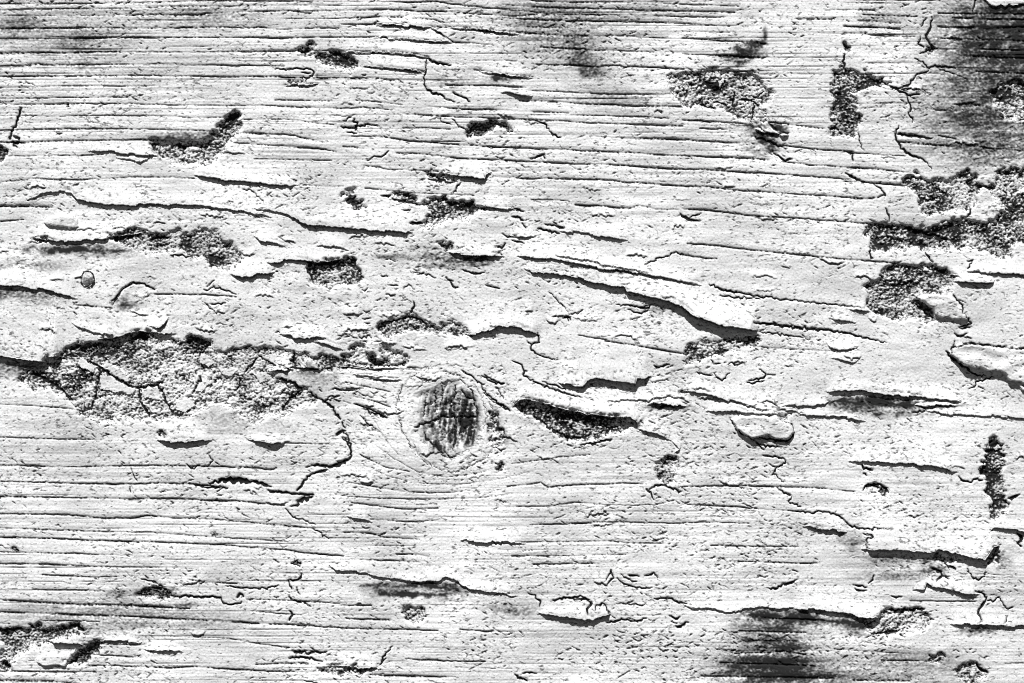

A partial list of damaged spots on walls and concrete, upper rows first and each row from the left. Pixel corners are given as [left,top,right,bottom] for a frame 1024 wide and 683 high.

spalling [89,111,298,186]
spalling [668,68,787,136]
spalling [830,44,891,138]
crack [887,19,965,169]
spalling [0,301,540,444]
spalling [26,164,515,291]
crack [188,270,499,539]
crack [616,304,650,320]
spalling [513,351,1024,484]
spalling [829,168,1024,324]
peeling [861,436,1024,595]